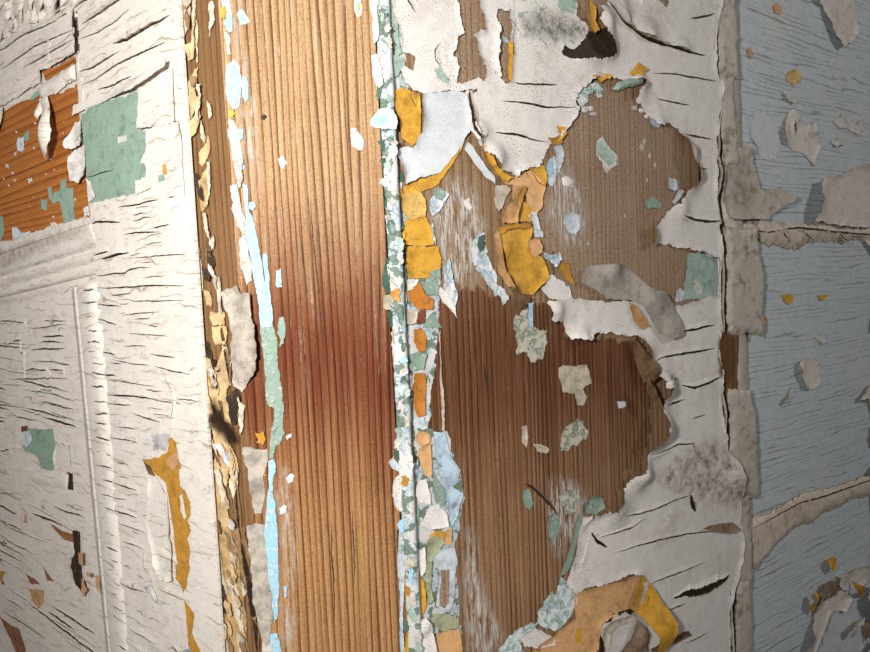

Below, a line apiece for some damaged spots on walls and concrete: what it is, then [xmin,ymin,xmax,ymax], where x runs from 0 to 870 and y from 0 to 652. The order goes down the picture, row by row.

crack [0,0,170,92]
peeling [785,69,802,86]
peeling [819,0,860,48]
peeling [723,109,844,220]
peeling [815,164,870,246]
crack [0,192,198,652]
peeling [0,0,257,652]
peeling [354,0,718,652]
peeling [799,358,822,390]
peeling [806,556,870,652]